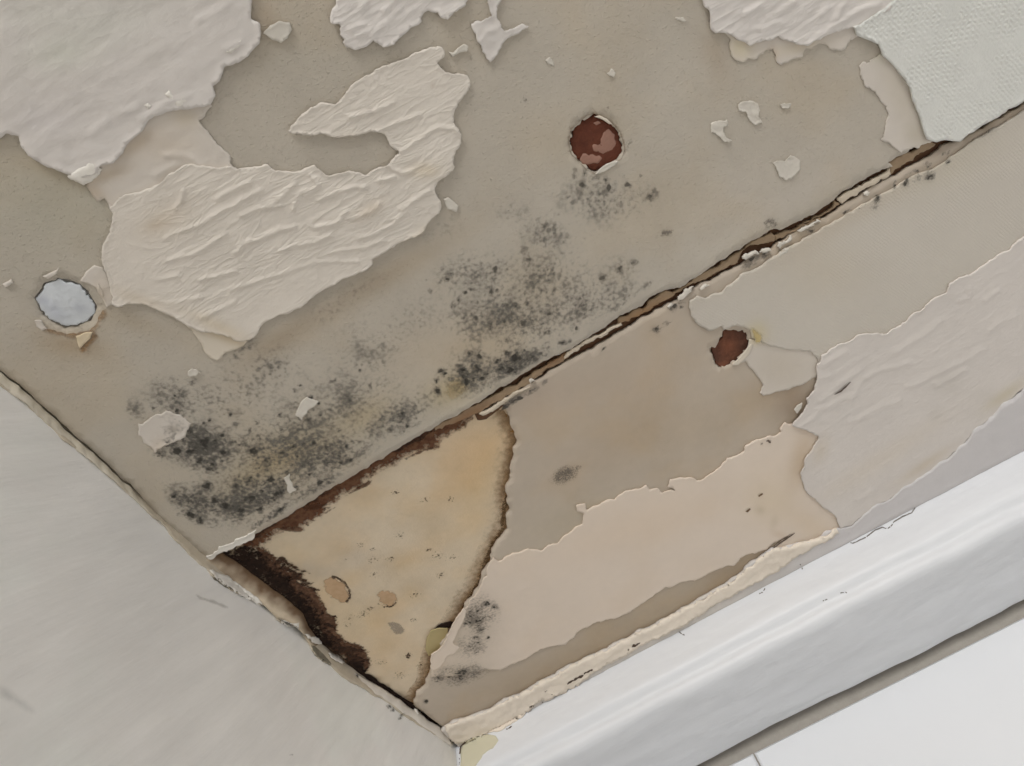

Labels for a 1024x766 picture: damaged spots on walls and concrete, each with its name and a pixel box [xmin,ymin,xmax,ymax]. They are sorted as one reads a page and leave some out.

peeling [702,0,894,65]
peeling [0,0,529,361]
peeling [711,120,732,142]
peeling [738,100,762,126]
peeling [859,52,933,153]
leakage [451,283,594,344]
crack [435,140,949,431]
leakage [435,339,542,393]
peeling [425,236,1024,678]
leakage [157,386,487,725]
leakage [435,388,536,653]
crack [852,508,915,544]